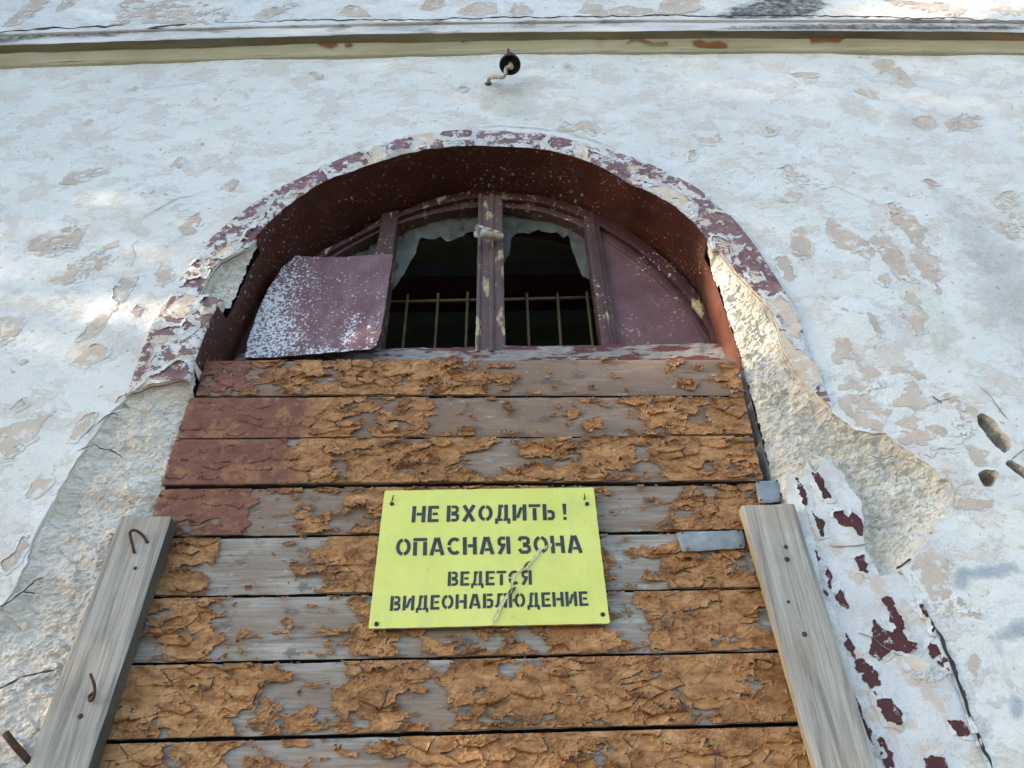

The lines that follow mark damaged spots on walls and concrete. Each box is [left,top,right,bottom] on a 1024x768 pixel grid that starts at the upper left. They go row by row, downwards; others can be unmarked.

peeling [1,0,78,27]
peeling [108,0,229,26]
peeling [254,3,303,21]
peeling [419,0,446,12]
peeling [456,1,534,17]
peeling [577,0,705,15]
peeling [884,0,967,17]
peeling [221,178,240,191]
crack [77,394,126,458]
spalling [0,186,1007,768]
crack [0,576,46,607]